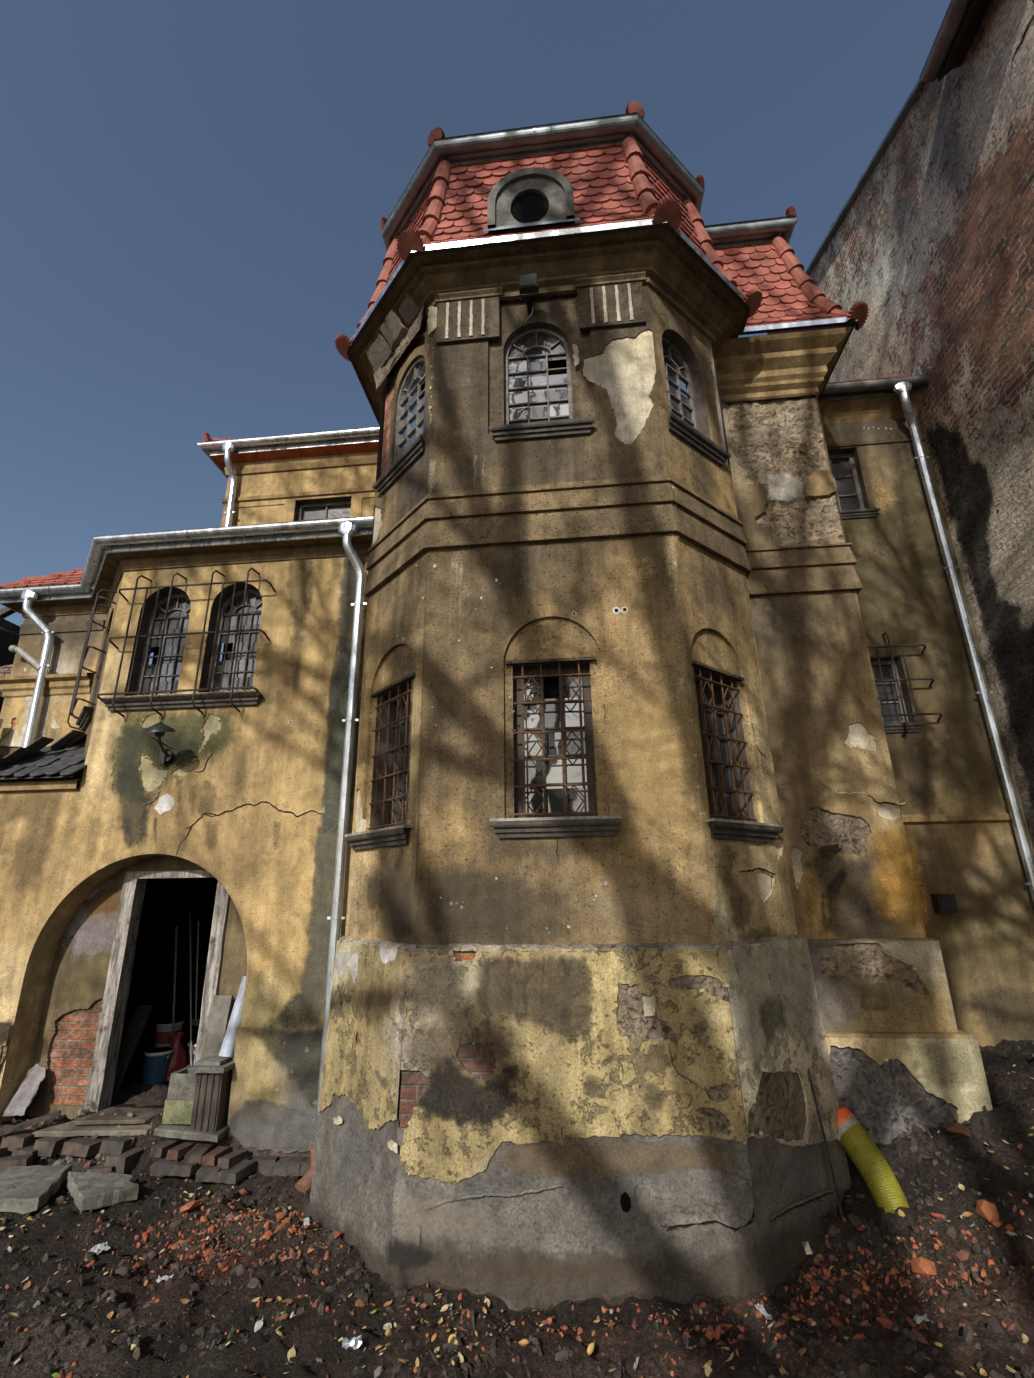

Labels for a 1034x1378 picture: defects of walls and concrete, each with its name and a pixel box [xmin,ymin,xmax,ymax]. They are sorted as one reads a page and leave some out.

crack [1011,0,1034,63]
peeling [572,328,656,444]
peeling [710,344,845,547]
damp [927,426,1034,806]
damp [118,776,156,846]
crack [176,800,325,854]
flaking render [757,803,902,904]
flaking render [46,998,103,1107]
flaking render [616,975,730,1045]
flaking render [817,943,931,996]
flaking render [829,1045,961,1145]
flaking render [308,1070,851,1311]